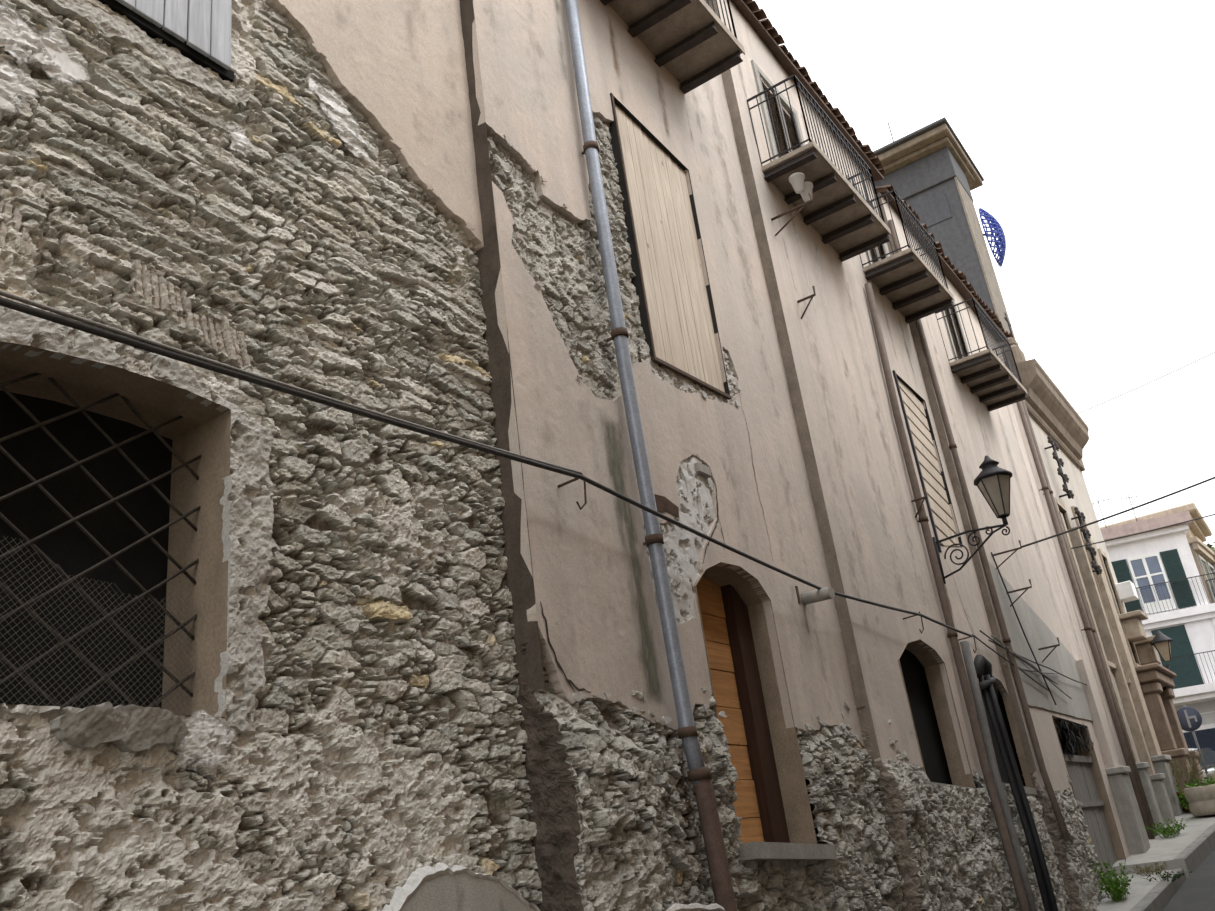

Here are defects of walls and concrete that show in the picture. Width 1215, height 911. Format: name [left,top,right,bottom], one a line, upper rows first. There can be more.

flaking render [487,114,742,407]
flaking render [643,457,715,625]
peeling [573,691,611,702]
corrosion [671,749,698,855]